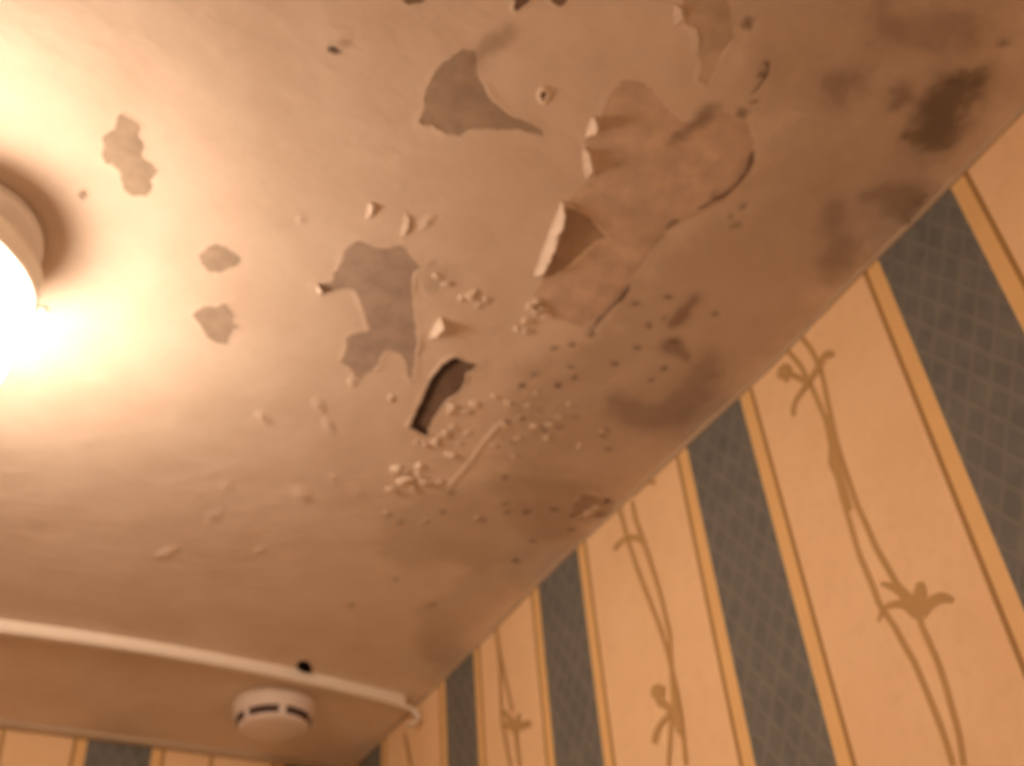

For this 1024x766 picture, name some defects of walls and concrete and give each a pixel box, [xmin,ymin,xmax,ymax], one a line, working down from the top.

peeling [673,0,741,91]
peeling [412,43,551,142]
peeling [98,110,162,200]
peeling [512,73,762,335]
peeling [193,240,244,275]
peeling [188,300,244,347]
peeling [307,210,490,459]